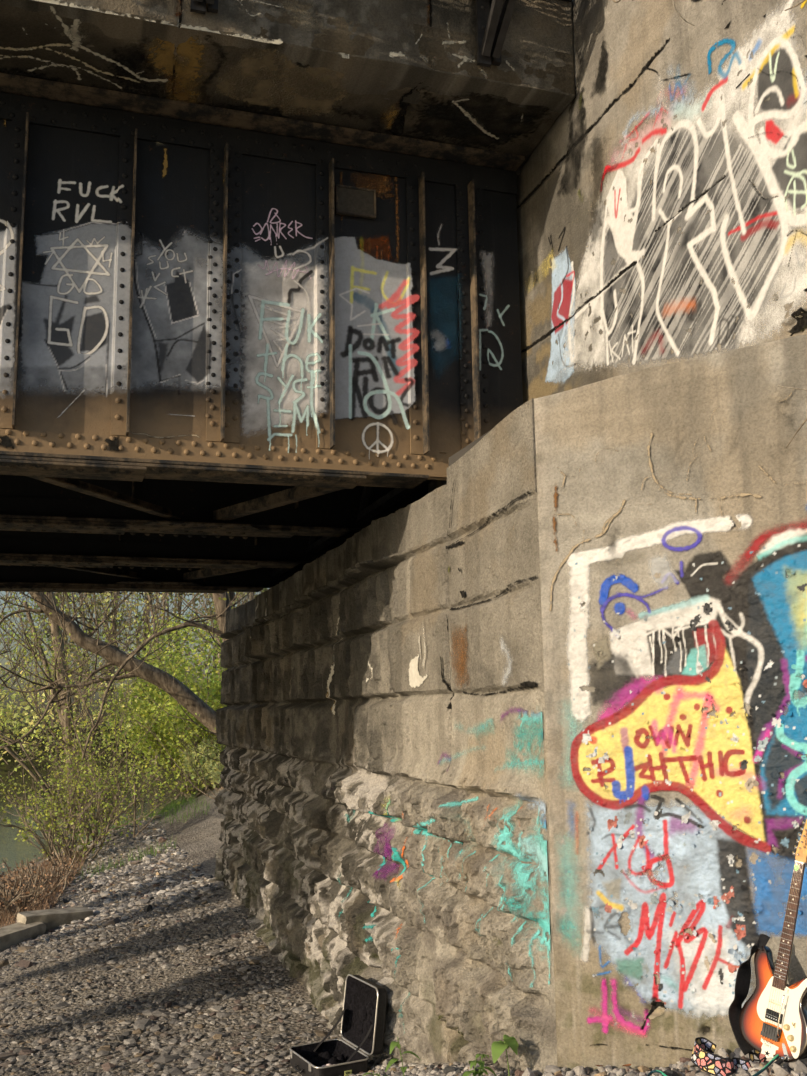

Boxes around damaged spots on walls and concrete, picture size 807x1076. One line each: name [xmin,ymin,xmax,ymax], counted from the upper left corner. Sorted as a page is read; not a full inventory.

leakage [407,86,549,151]
crack [517,38,670,209]
spalling [788,307,807,336]